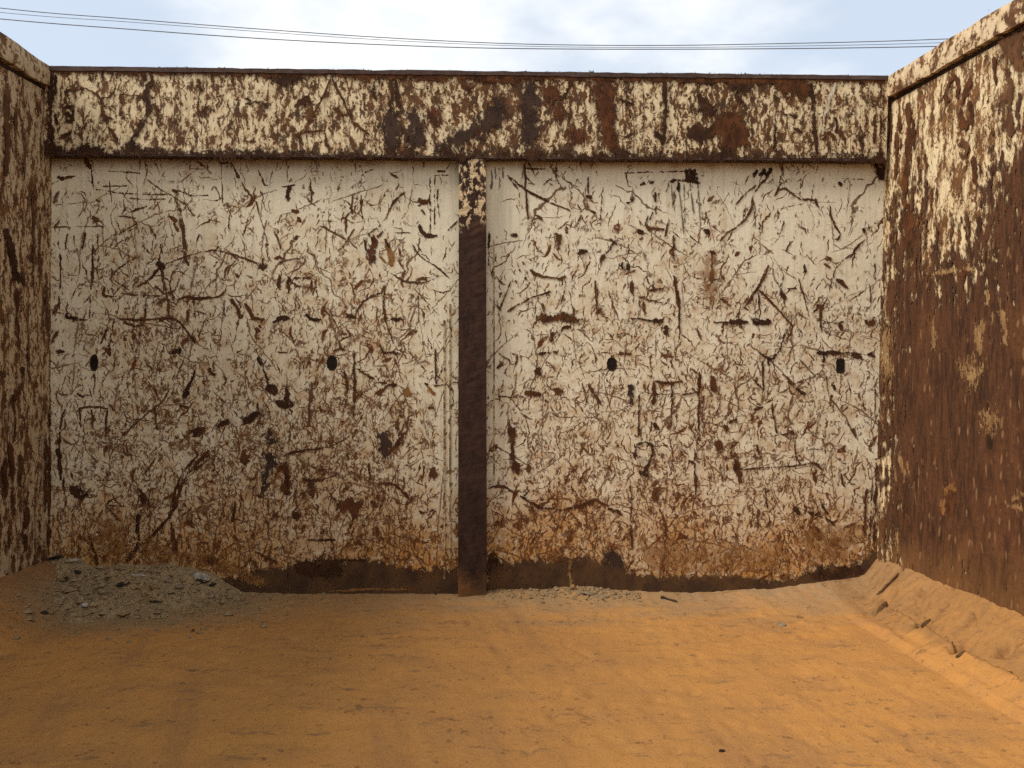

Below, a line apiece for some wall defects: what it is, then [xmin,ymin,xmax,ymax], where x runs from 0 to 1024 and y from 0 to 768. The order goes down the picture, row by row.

rust [3,93,27,180]
peeling [822,82,837,134]
rust [4,191,49,385]
rust [44,27,1024,616]
rust [2,444,30,552]